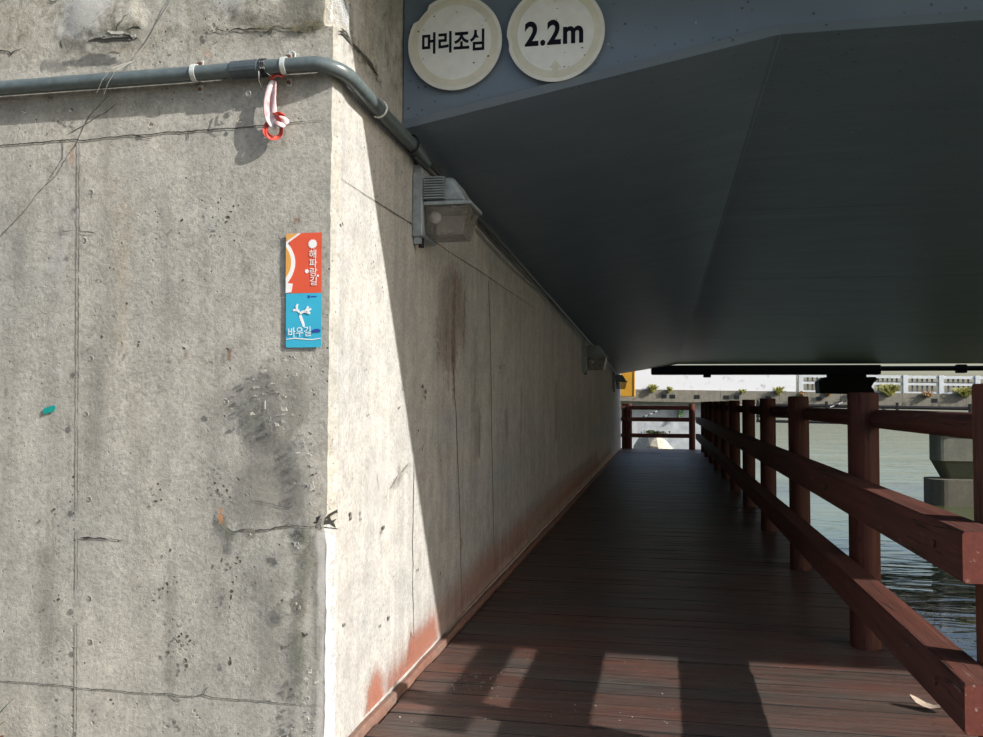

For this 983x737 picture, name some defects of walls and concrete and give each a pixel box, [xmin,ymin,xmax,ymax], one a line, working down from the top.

spalling [58,26,141,51]
crack [0,95,264,506]
crack [227,500,314,533]